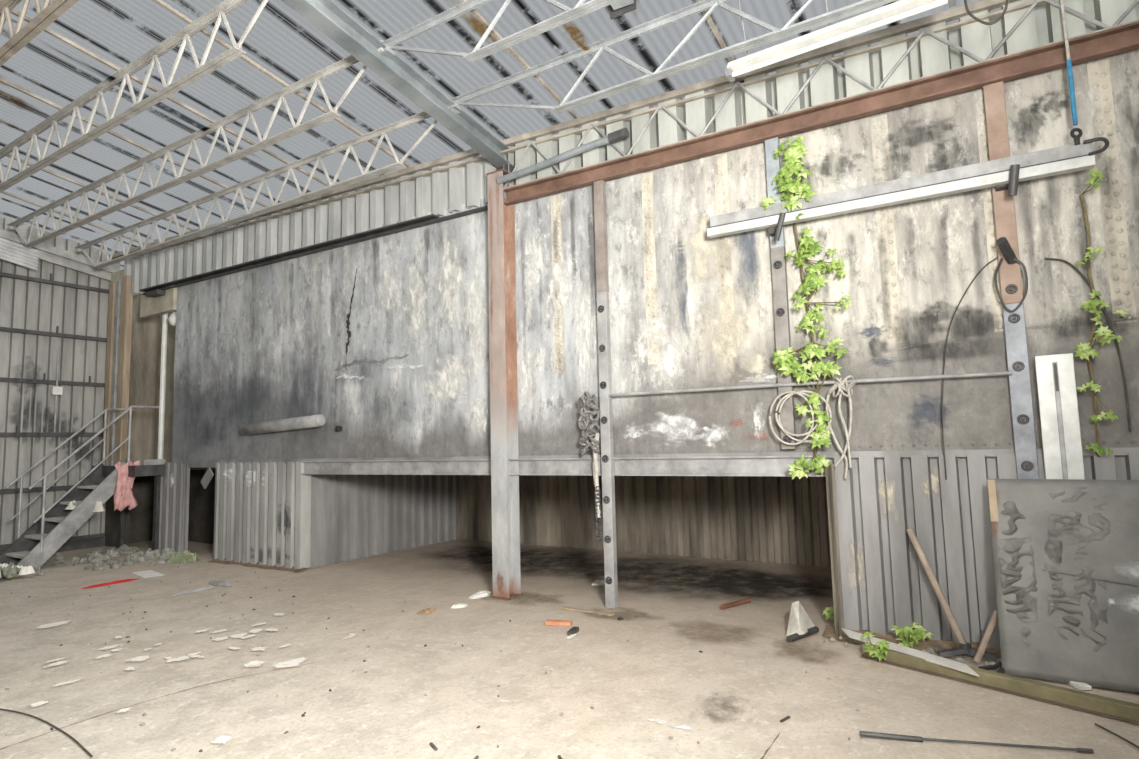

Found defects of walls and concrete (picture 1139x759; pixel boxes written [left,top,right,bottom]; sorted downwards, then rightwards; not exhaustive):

leakage [1017,94,1068,140]
leakage [821,157,857,190]
leakage [888,125,955,178]
crack [345,268,357,362]
leakage [378,242,487,398]
efflorescence [473,401,488,431]
peeling [629,414,724,446]